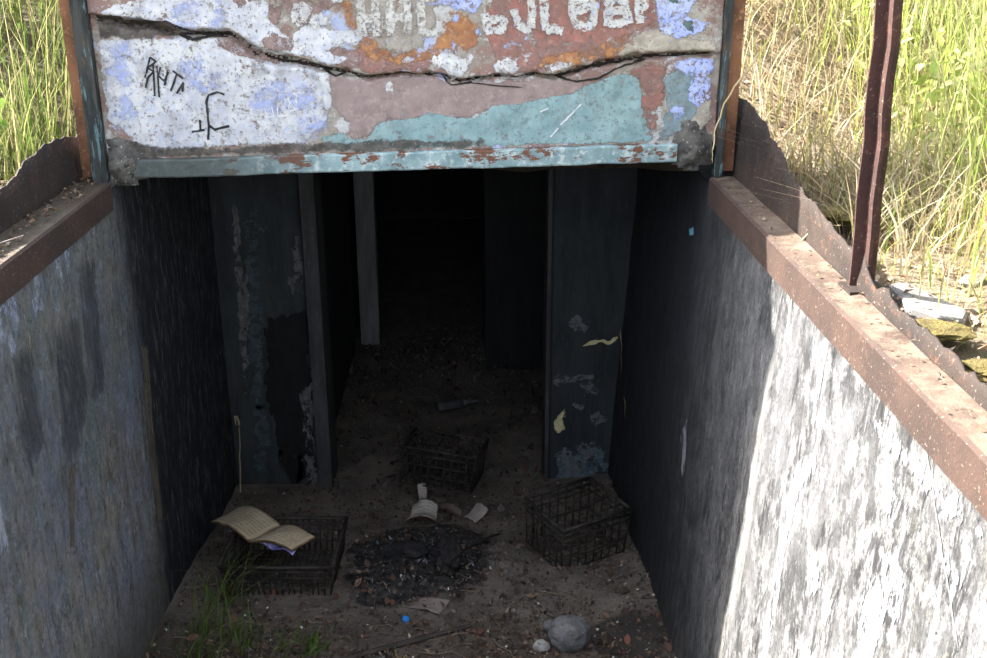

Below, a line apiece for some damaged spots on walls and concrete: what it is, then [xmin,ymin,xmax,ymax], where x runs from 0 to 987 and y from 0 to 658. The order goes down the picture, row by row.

crack [96,15,710,88]
peeling [99,0,717,151]
peeling [554,440,609,478]
damp [714,348,773,658]
damp [761,456,809,658]
damp [811,338,829,450]